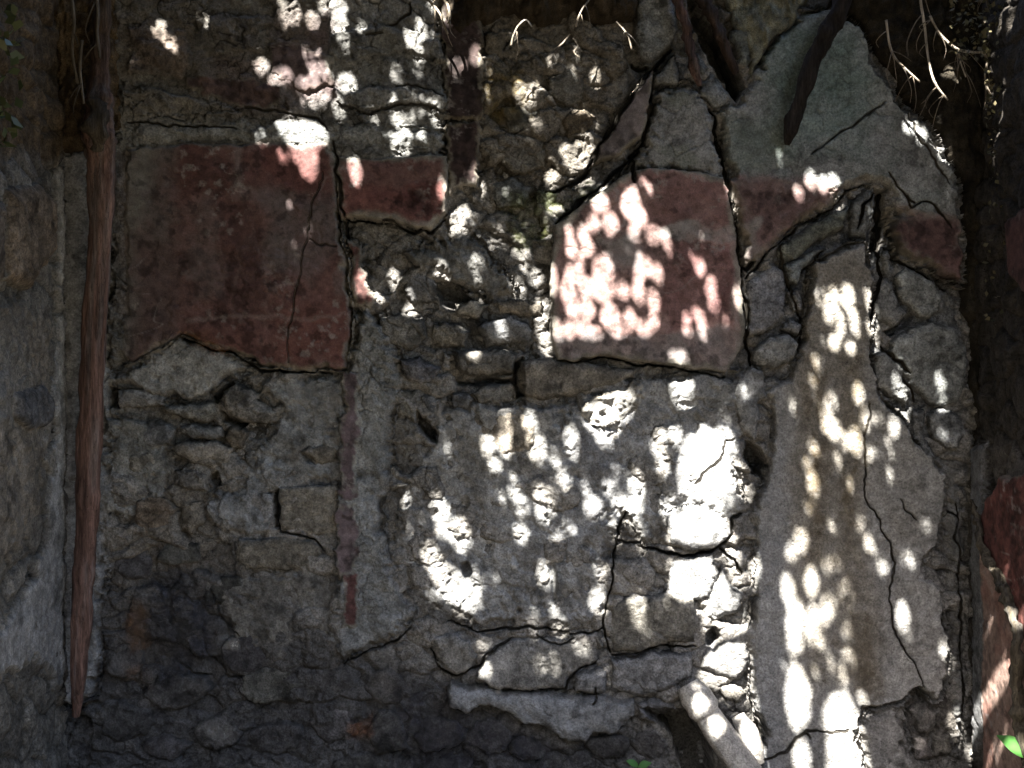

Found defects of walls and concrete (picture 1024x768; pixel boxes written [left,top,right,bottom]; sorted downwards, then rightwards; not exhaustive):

crack [127,107,446,373]
peeling [437,0,506,196]
spalling [492,0,729,238]
crack [708,101,952,366]
spalling [117,380,277,535]
spalling [231,371,363,629]
crack [277,500,325,552]
crack [430,512,743,705]
crack [863,404,925,688]